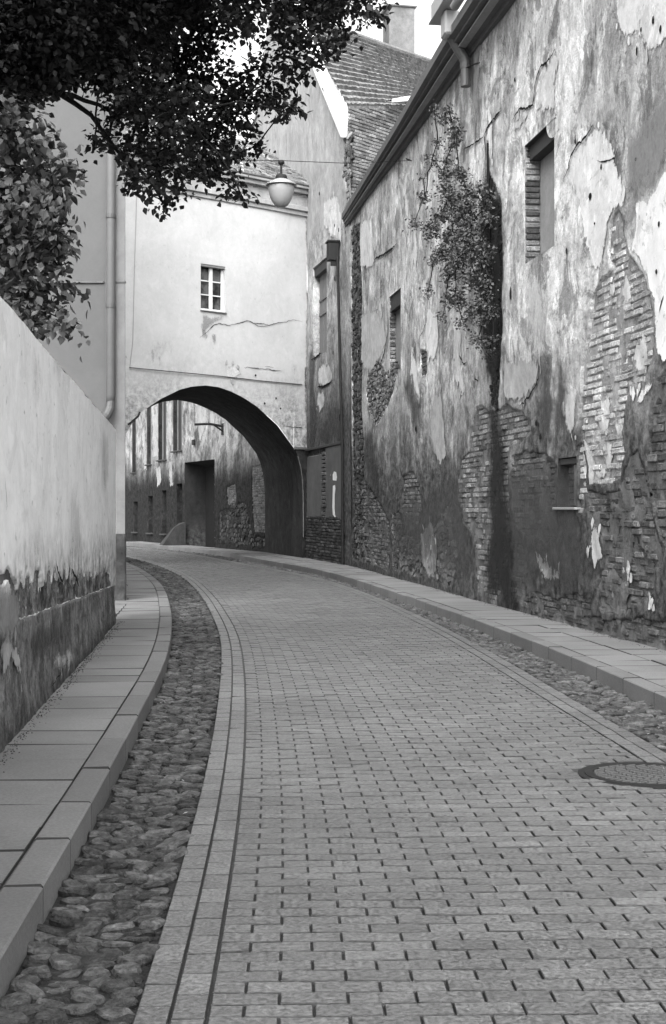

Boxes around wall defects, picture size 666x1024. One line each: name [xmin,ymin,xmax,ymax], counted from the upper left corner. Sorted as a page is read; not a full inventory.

crack [464,49,555,166]
crack [564,125,619,177]
crack [202,320,298,336]
spalling [319,109,666,650]
leakage [478,171,591,611]